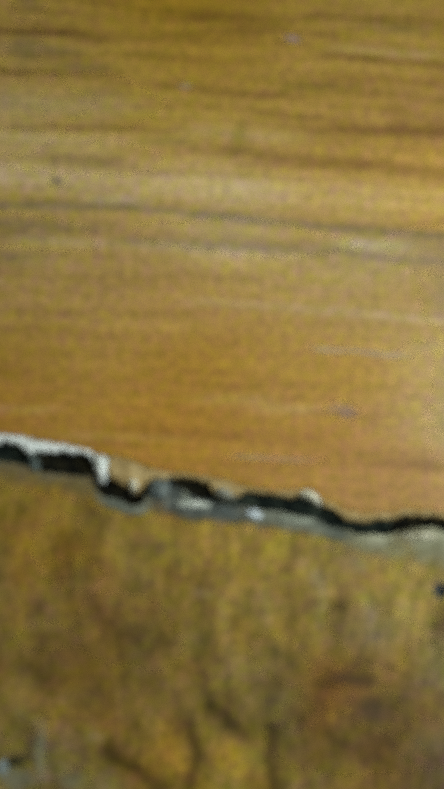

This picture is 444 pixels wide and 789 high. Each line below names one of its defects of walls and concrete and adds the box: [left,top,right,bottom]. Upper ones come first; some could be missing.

crack [0,441,147,506]
crack [169,478,444,535]